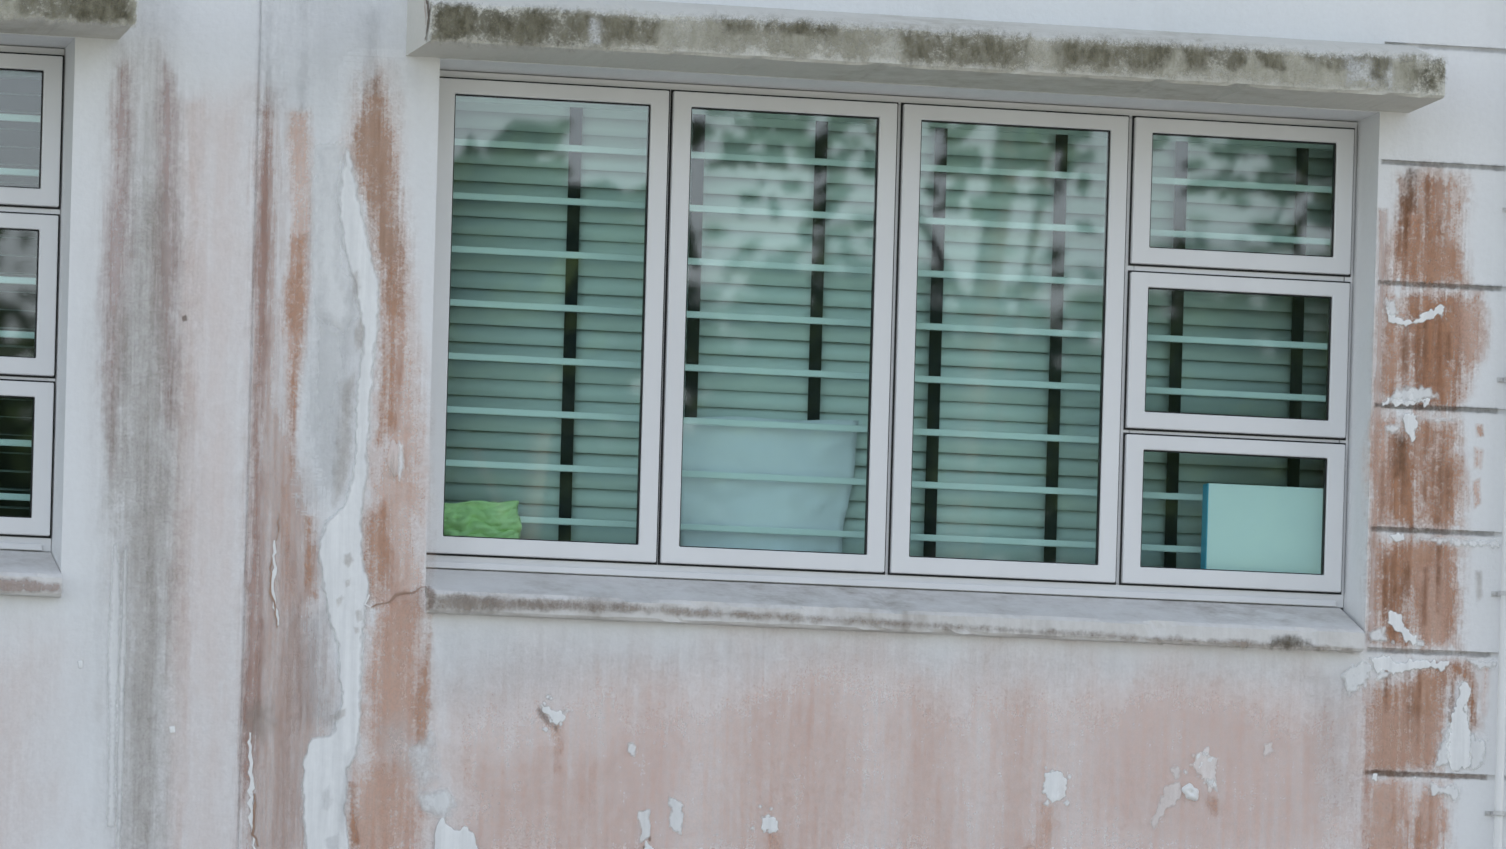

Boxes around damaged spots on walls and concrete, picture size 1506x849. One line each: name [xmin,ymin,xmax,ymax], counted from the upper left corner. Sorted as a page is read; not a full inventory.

corrosion [288,115,308,410]
peeling [1385,299,1444,326]
peeling [303,146,379,849]
corrosion [350,84,429,849]
corrosion [1369,173,1479,646]
crack [364,586,426,608]
peeling [1342,610,1450,696]
peeling [413,732,478,849]
spalling [541,695,569,750]
spalling [1042,767,1071,842]
corrosion [1366,664,1474,849]
peeling [1414,681,1485,800]